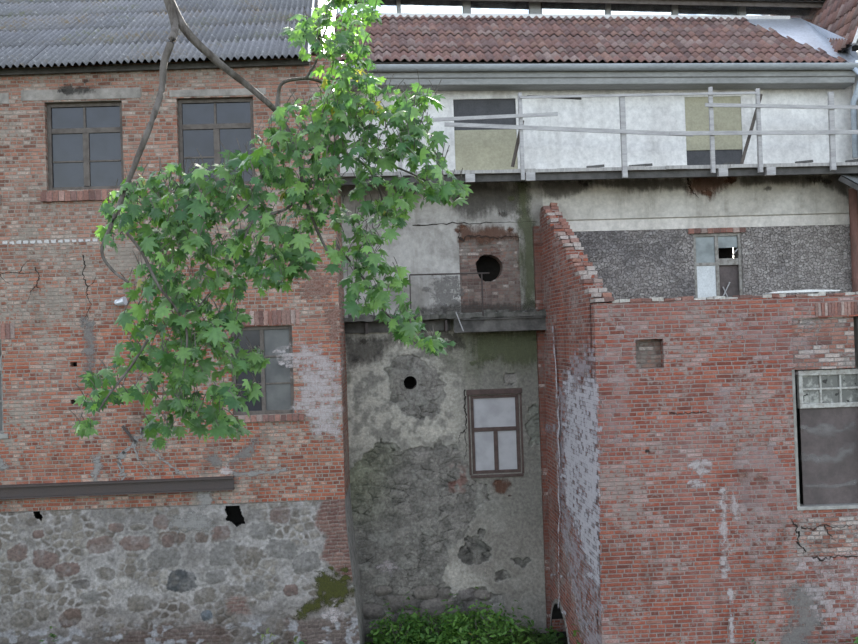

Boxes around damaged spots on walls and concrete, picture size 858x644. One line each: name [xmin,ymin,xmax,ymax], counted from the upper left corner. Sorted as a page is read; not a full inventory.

crack [0,260,41,299]
crack [82,255,96,324]
flaking render [384,354,447,420]
peeling [525,341,606,644]
flaking render [350,438,511,642]
crack [790,518,858,561]
leakage [320,600,345,623]